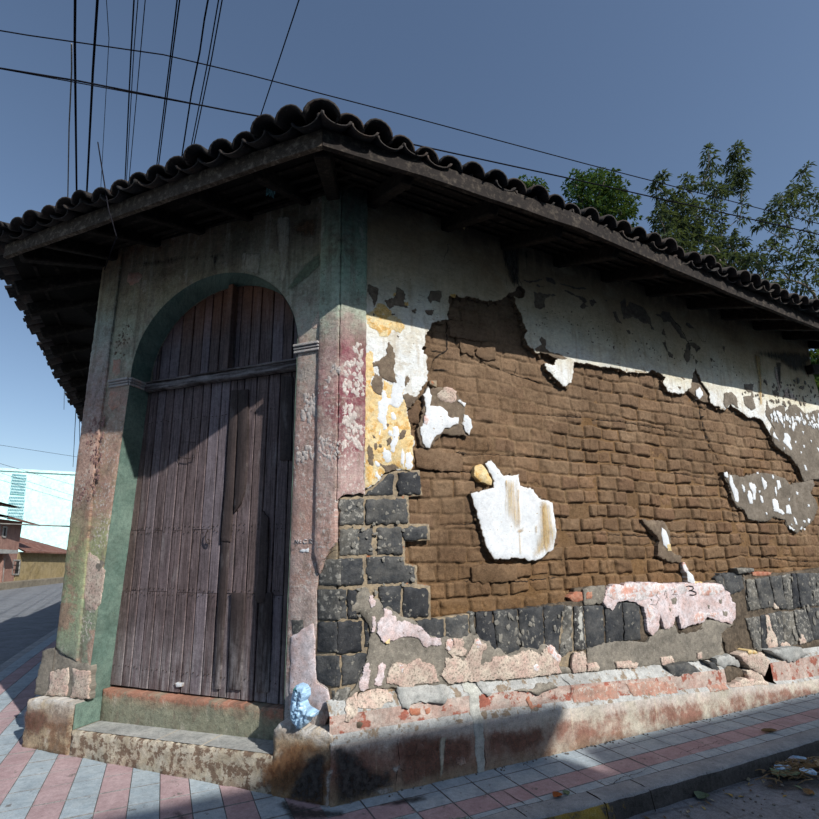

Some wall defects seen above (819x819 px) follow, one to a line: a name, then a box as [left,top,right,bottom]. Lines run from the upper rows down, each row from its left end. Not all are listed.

crack [430,319,452,371]
crack [475,360,543,384]
crack [420,442,645,473]
spalling [296,277,819,635]
crack [520,407,818,562]
peeling [344,595,600,728]
peeling [615,660,638,669]
peeling [572,681,678,703]
water stain [281,748,398,819]